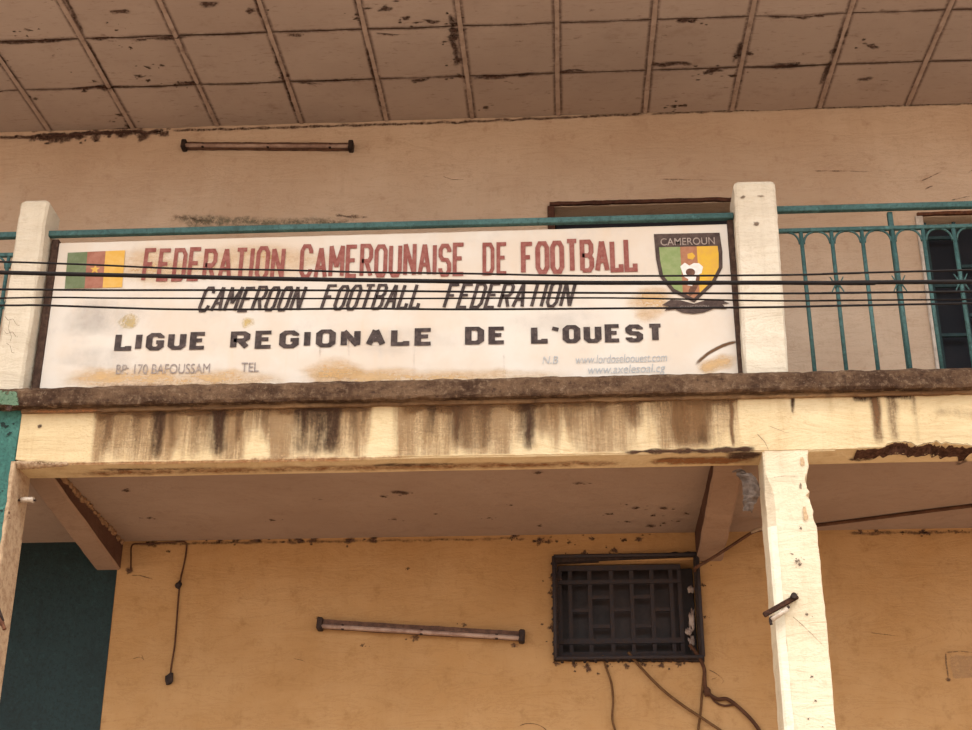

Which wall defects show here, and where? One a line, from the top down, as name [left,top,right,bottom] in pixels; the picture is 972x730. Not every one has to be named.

peeling [0,390,19,406]
damp [94,407,371,458]
damp [397,399,737,453]
spalling [850,440,972,465]